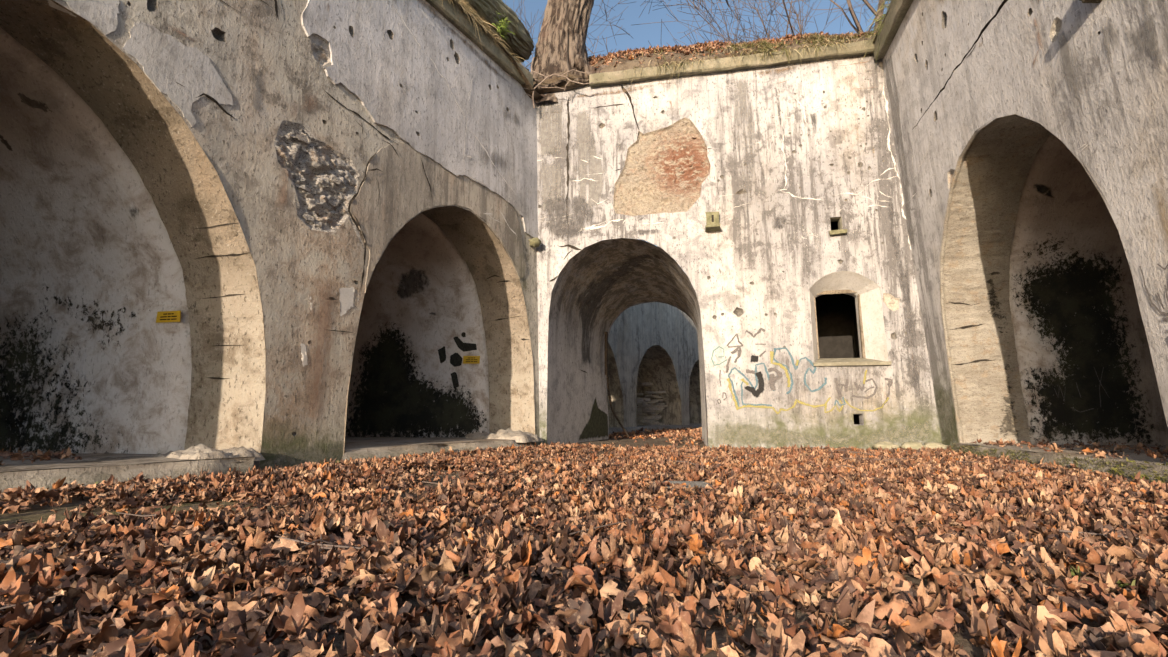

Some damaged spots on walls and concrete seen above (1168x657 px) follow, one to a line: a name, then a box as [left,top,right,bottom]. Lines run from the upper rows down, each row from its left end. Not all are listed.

crack [913,0,1008,129]
spalling [274,120,367,255]
flaking render [613,118,711,216]
mould [0,286,150,453]
damp [300,343,308,367]
damp [339,287,354,316]
damp [345,322,487,443]
mould [986,233,1158,445]